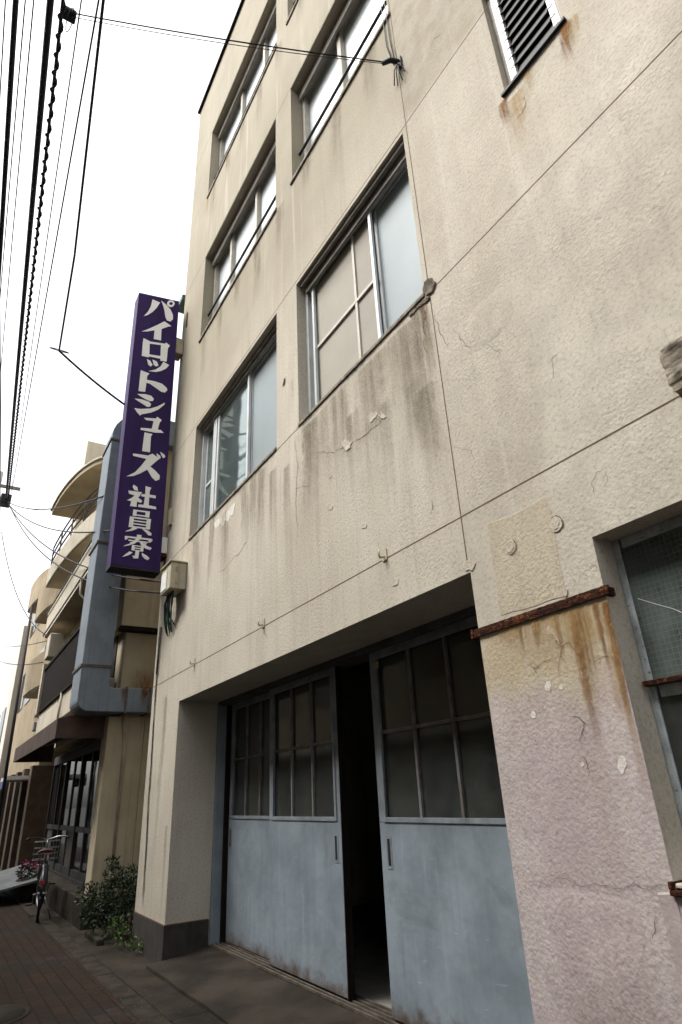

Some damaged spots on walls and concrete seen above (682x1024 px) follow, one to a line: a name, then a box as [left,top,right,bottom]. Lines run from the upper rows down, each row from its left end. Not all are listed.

rust [470,585,627,708]